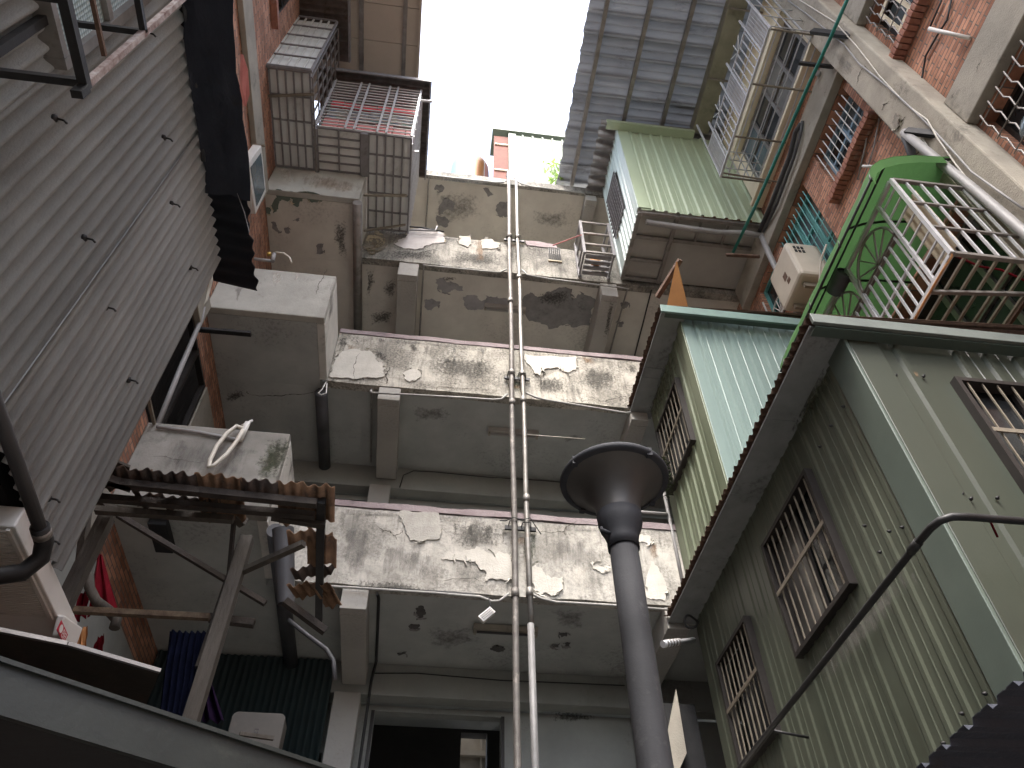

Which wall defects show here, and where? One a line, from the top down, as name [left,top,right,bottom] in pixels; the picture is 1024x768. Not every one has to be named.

spalling [363,185,501,255]
peeling [523,353,579,375]
leakage [258,440,292,480]
peeling [399,510,443,543]
spalling [441,546,512,583]
spalling [532,561,564,597]
spalling [589,561,611,573]
peeling [645,561,669,601]